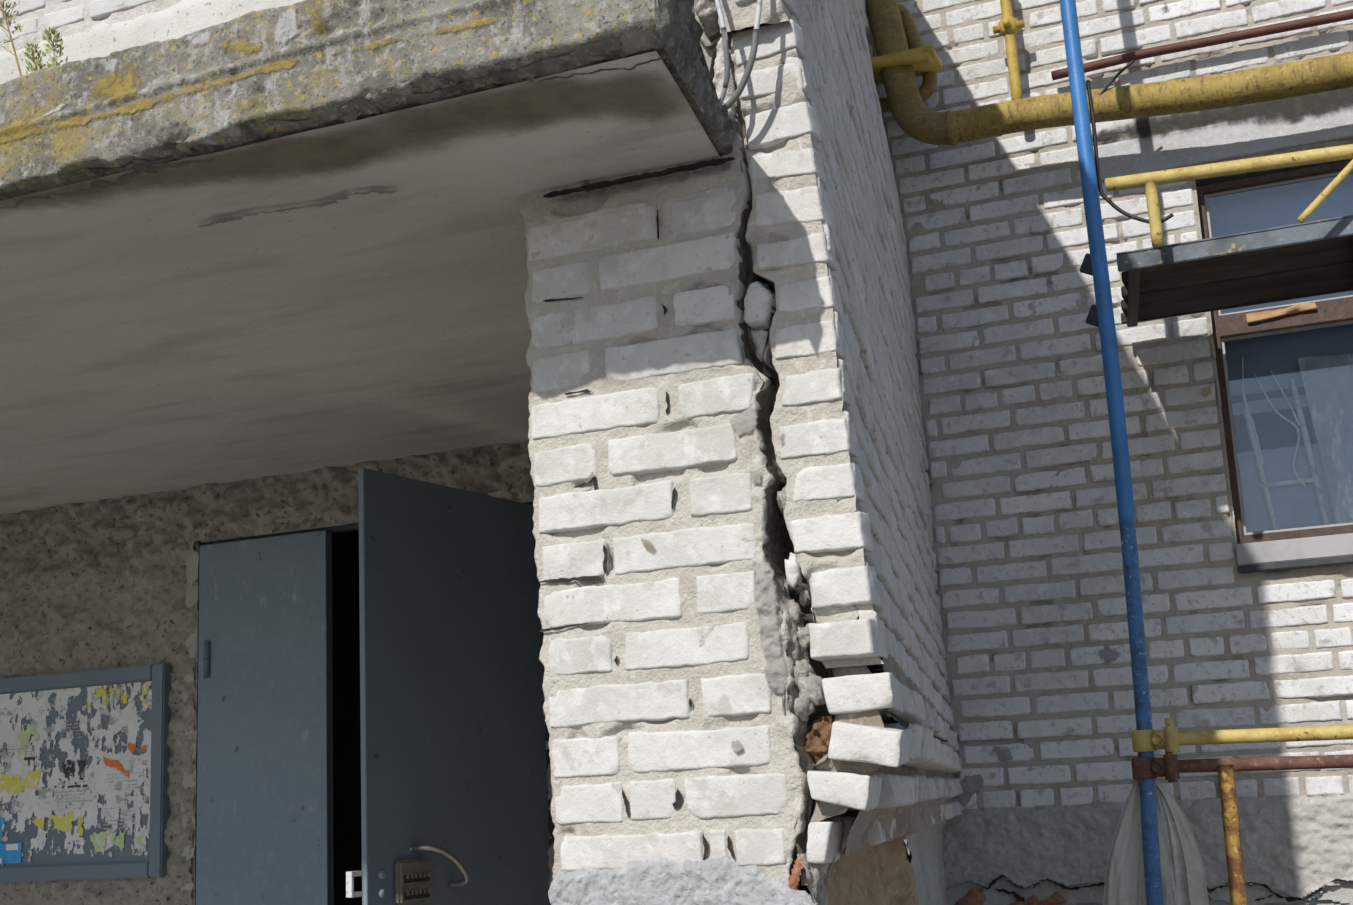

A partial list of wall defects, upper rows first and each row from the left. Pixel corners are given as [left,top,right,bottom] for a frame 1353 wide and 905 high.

water stain [187,32,210,44]
water stain [275,10,298,42]
water stain [0,80,678,210]
crack [692,0,835,891]
spalling [789,820,918,905]
crack [977,874,1105,903]
crack [1207,879,1353,902]